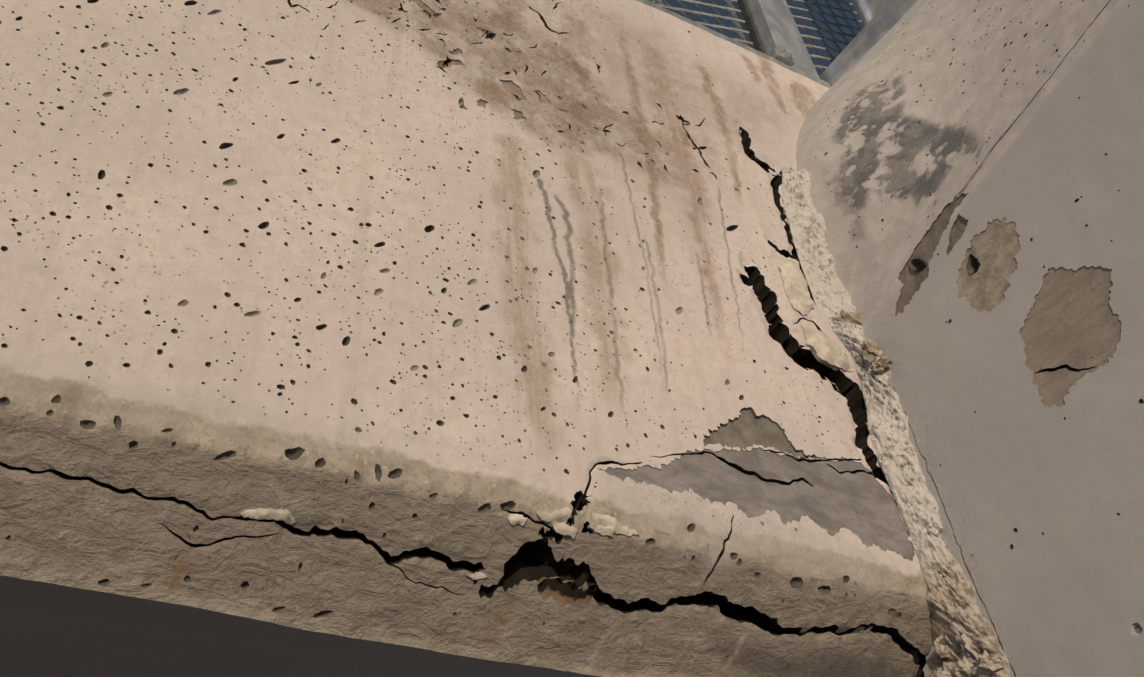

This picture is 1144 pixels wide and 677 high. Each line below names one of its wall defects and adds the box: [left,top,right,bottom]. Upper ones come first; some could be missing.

crack [287,0,717,180]
damp [420,0,668,172]
damp [538,179,576,371]
crack [684,127,897,505]
peeling [895,192,1021,316]
peeling [1019,266,1122,408]
crack [0,462,486,595]
crack [504,461,642,530]
crack [574,515,926,677]
spalling [599,407,915,561]
crack [893,385,1016,677]